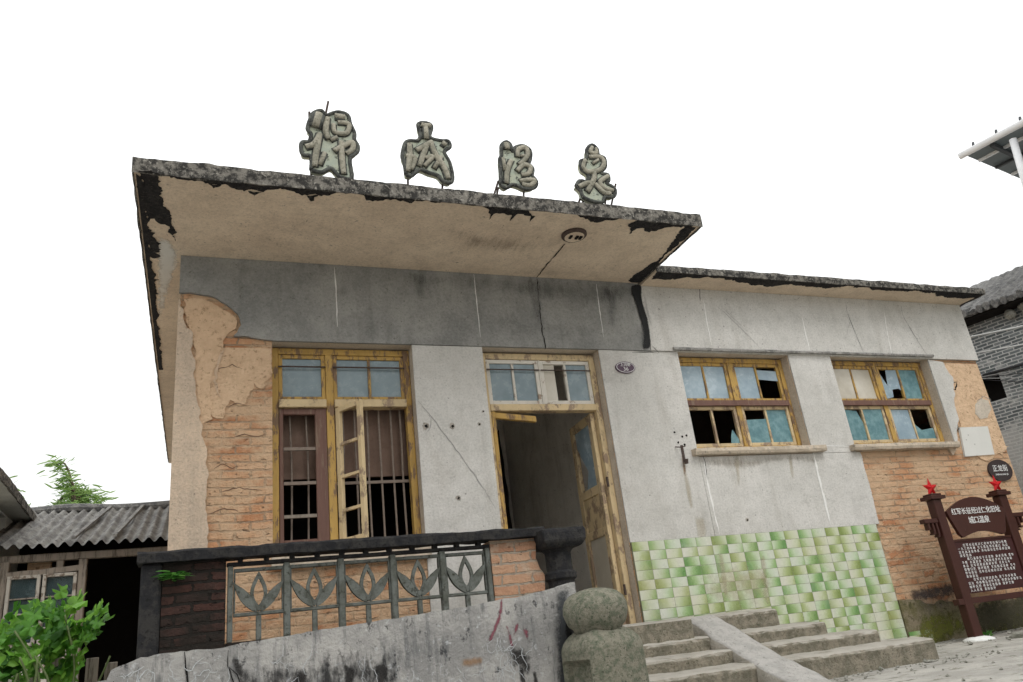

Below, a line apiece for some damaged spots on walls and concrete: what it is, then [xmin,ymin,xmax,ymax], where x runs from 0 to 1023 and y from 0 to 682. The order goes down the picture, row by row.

peeling [483,206,535,223]
peeling [578,215,618,223]
peeling [136,170,442,370]
crack [537,244,565,349]
water stain [631,285,651,348]
peeling [628,220,983,305]
spalling [184,298,242,424]
spalling [975,396,993,419]
crack [113,652,240,682]
water stain [233,659,256,682]
water stain [267,655,395,682]
crack [359,629,534,682]